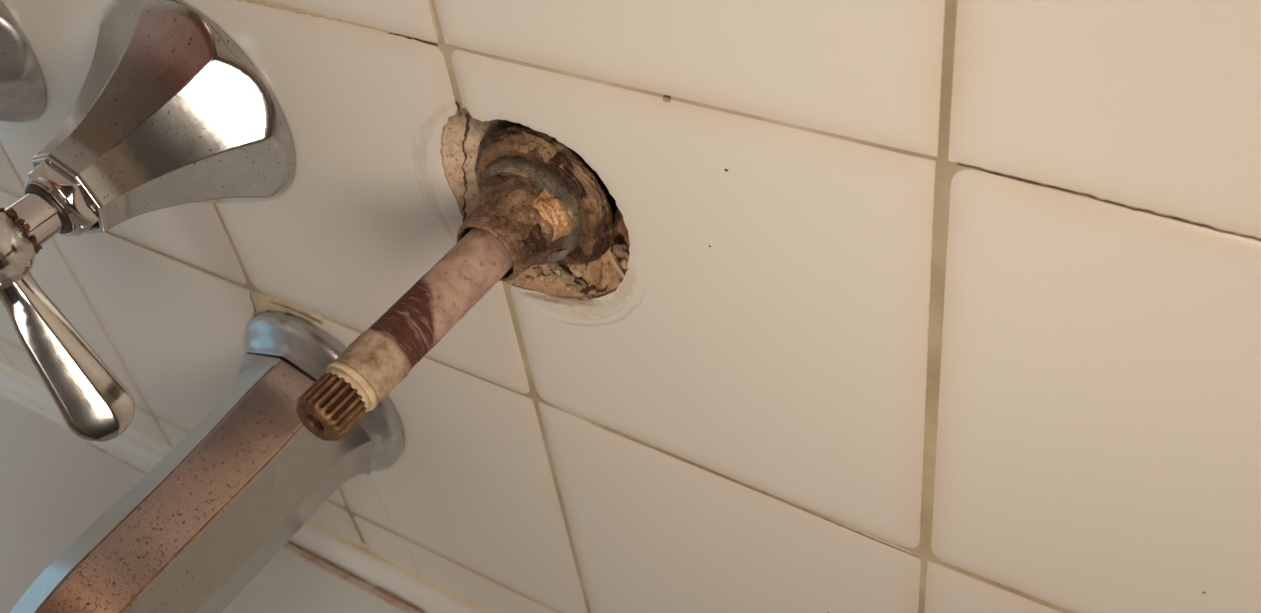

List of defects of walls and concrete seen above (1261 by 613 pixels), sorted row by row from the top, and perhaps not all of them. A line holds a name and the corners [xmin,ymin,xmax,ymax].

spalling [442,108,630,299]